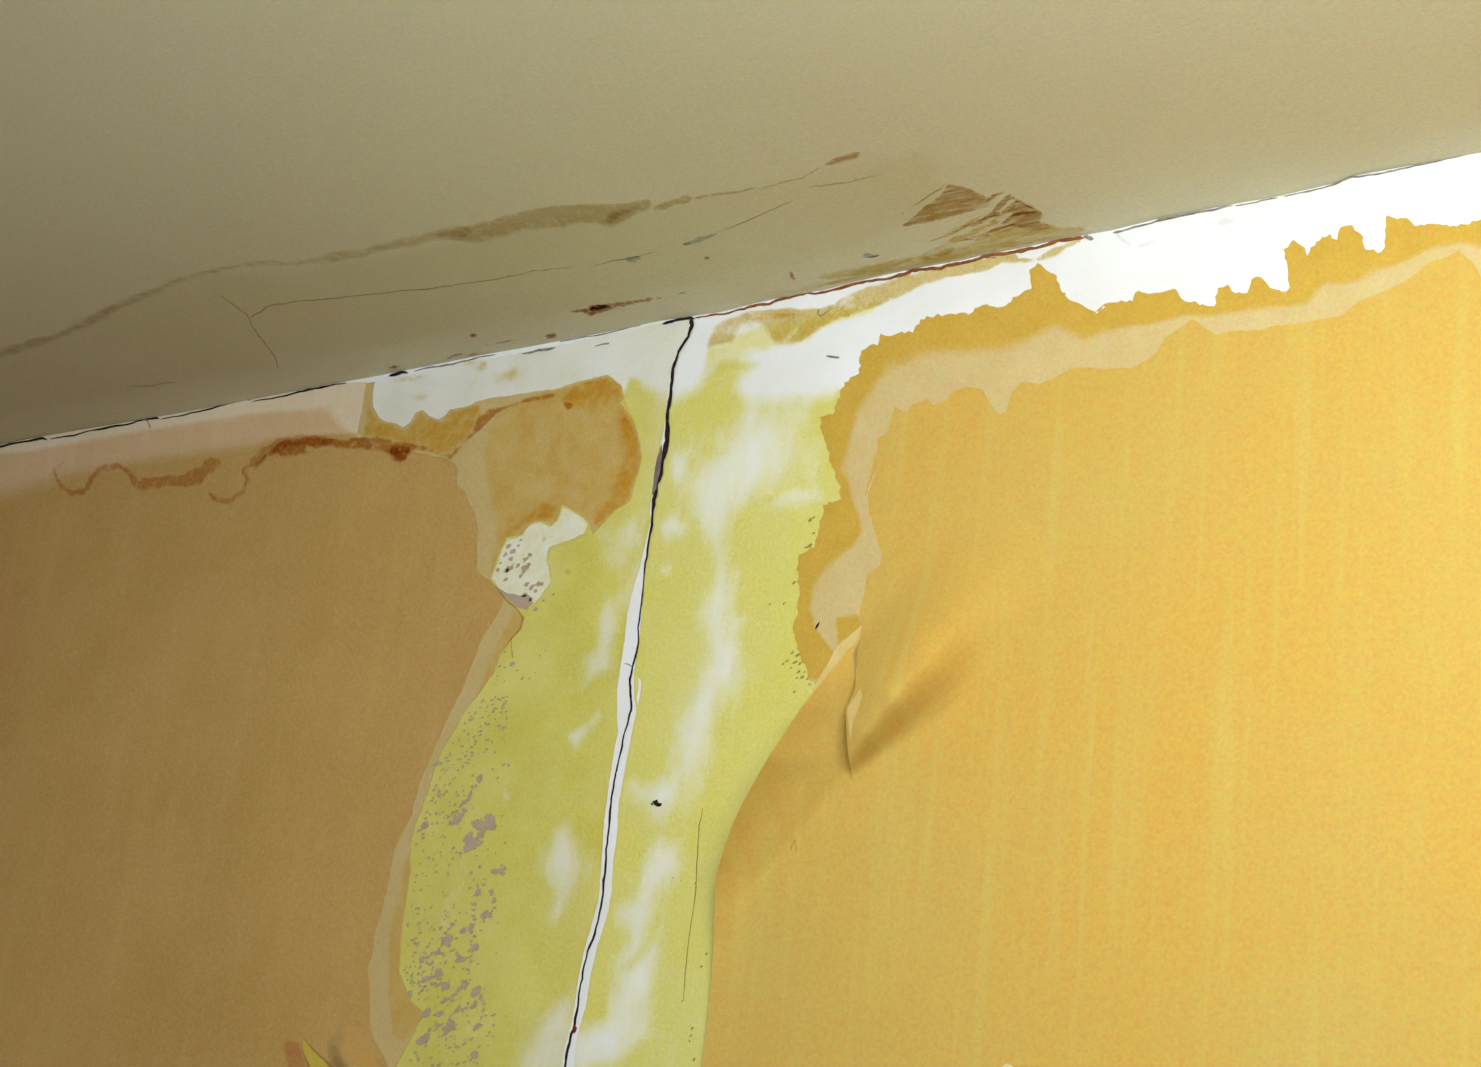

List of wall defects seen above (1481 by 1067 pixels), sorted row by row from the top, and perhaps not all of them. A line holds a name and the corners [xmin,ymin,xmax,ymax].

crack [0,383,345,448]
leakage [681,808,707,1002]
flaking render [373,154,1481,1067]
crack [389,152,1481,1067]